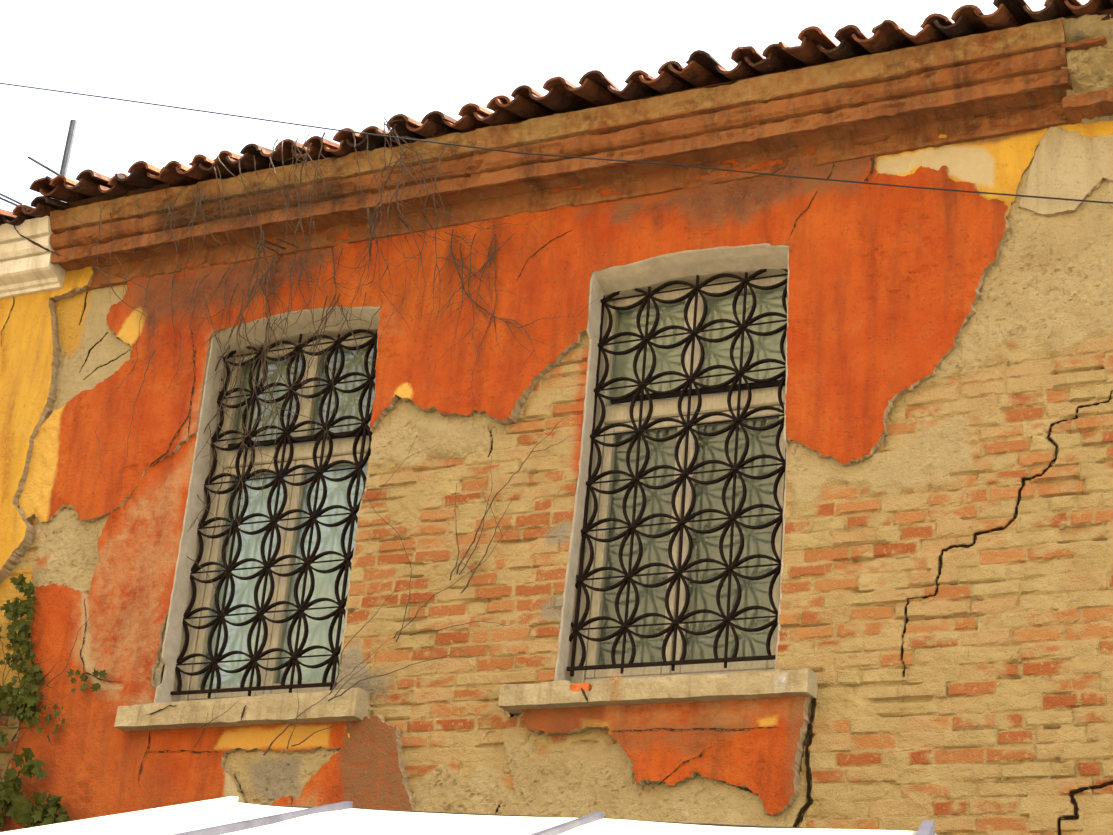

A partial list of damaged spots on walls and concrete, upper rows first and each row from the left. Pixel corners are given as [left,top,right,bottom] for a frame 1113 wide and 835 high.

flaking render [50,284,132,415]
flaking render [336,127,1113,835]
crack [901,390,1113,676]
flaking render [225,747,339,805]
crack [1058,781,1113,835]